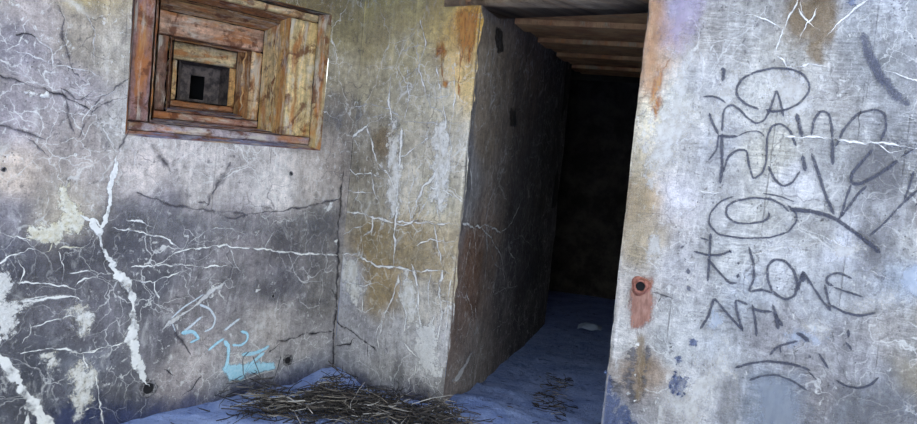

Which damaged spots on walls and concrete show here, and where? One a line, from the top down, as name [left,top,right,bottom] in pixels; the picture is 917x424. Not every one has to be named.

corrosion [436,9,478,99]
crack [0,8,530,424]
corrosion [629,278,654,400]